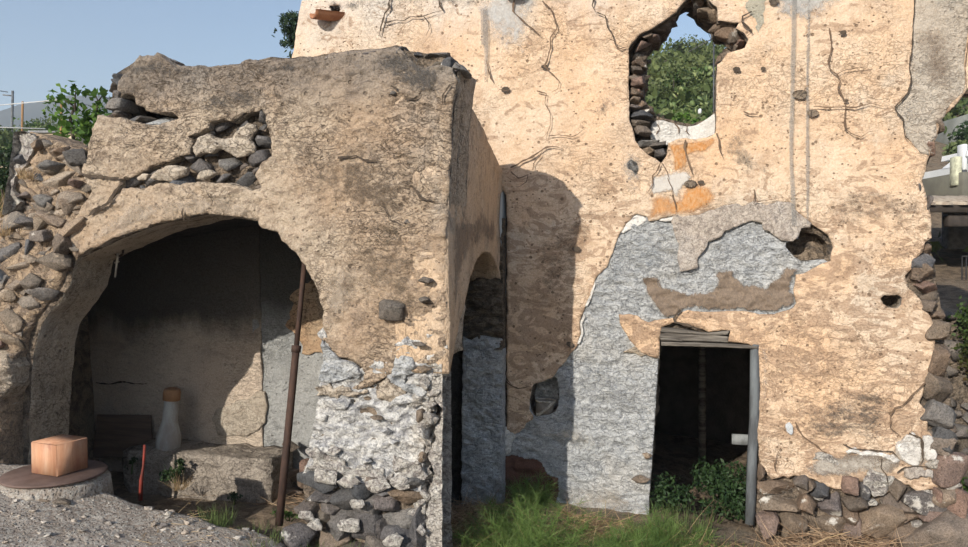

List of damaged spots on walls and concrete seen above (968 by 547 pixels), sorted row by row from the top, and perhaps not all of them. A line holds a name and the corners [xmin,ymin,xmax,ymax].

spalling [126,110,272,190]
crack [379,0,443,35]
crack [510,0,584,187]
crack [592,0,628,49]
flaking render [630,0,745,114]
crack [814,0,927,155]
spalling [303,328,434,492]
spalling [505,201,828,515]